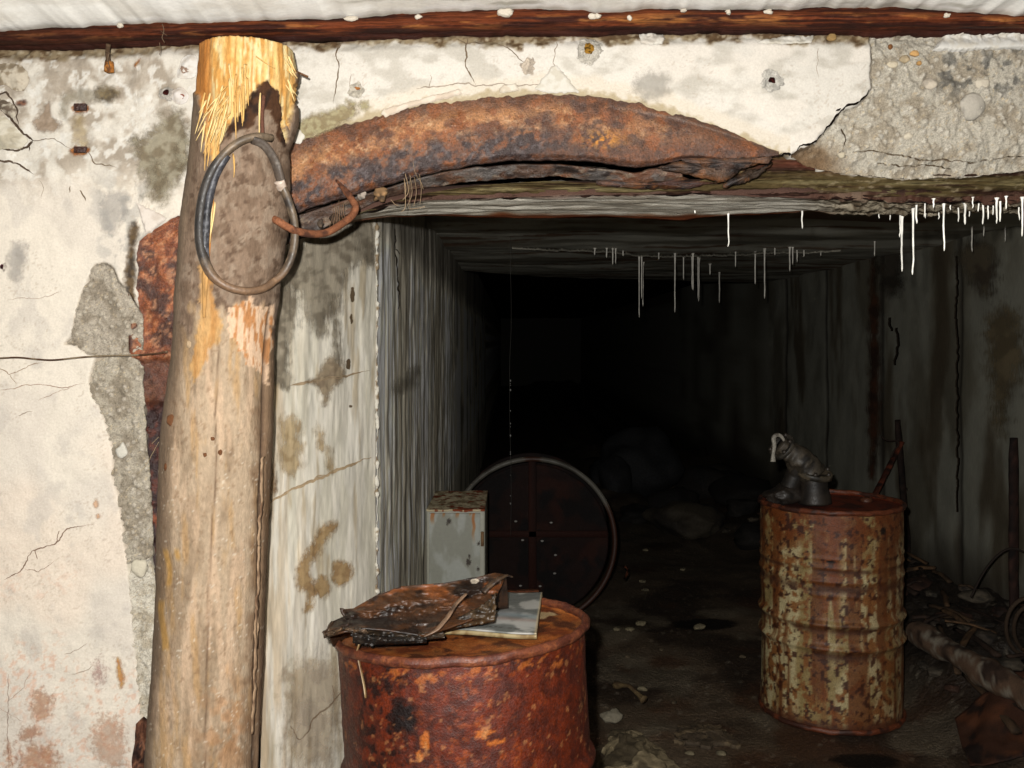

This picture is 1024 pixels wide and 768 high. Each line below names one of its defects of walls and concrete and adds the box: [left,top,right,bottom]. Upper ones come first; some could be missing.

leakage [32,102,60,132]
crack [0,91,114,199]
leakage [95,86,119,102]
leakage [131,110,191,202]
rust [596,156,773,190]
spalling [791,33,1024,180]
leakage [124,222,139,303]
leakage [877,254,904,296]
flaking render [68,263,156,719]
leakage [269,415,304,514]
crack [6,524,93,579]
leakage [296,522,354,613]